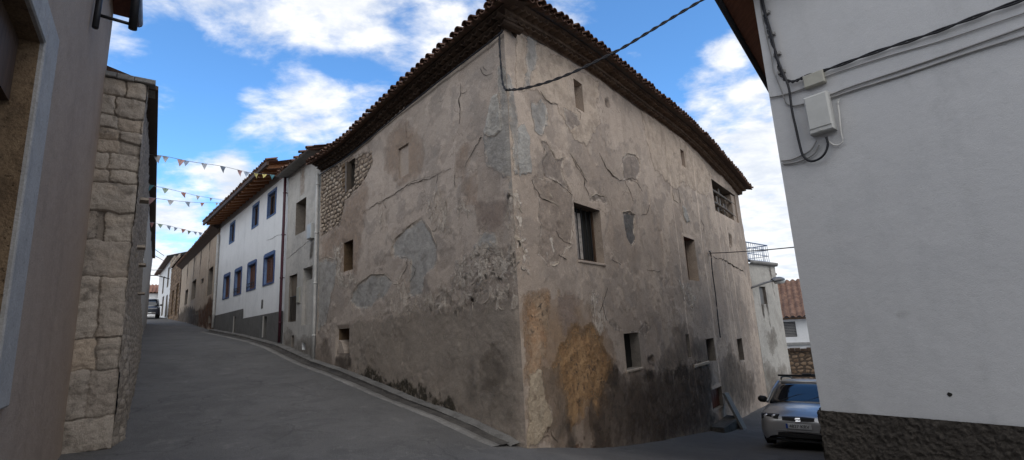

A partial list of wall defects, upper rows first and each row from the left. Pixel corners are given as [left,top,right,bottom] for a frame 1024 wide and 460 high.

flaking render [320,151,373,273]
crack [364,137,481,212]
peeling [471,92,581,311]
crack [571,154,650,215]
spalling [622,210,635,245]
peeling [622,153,640,182]
spalling [527,324,614,448]
leakage [589,344,753,448]